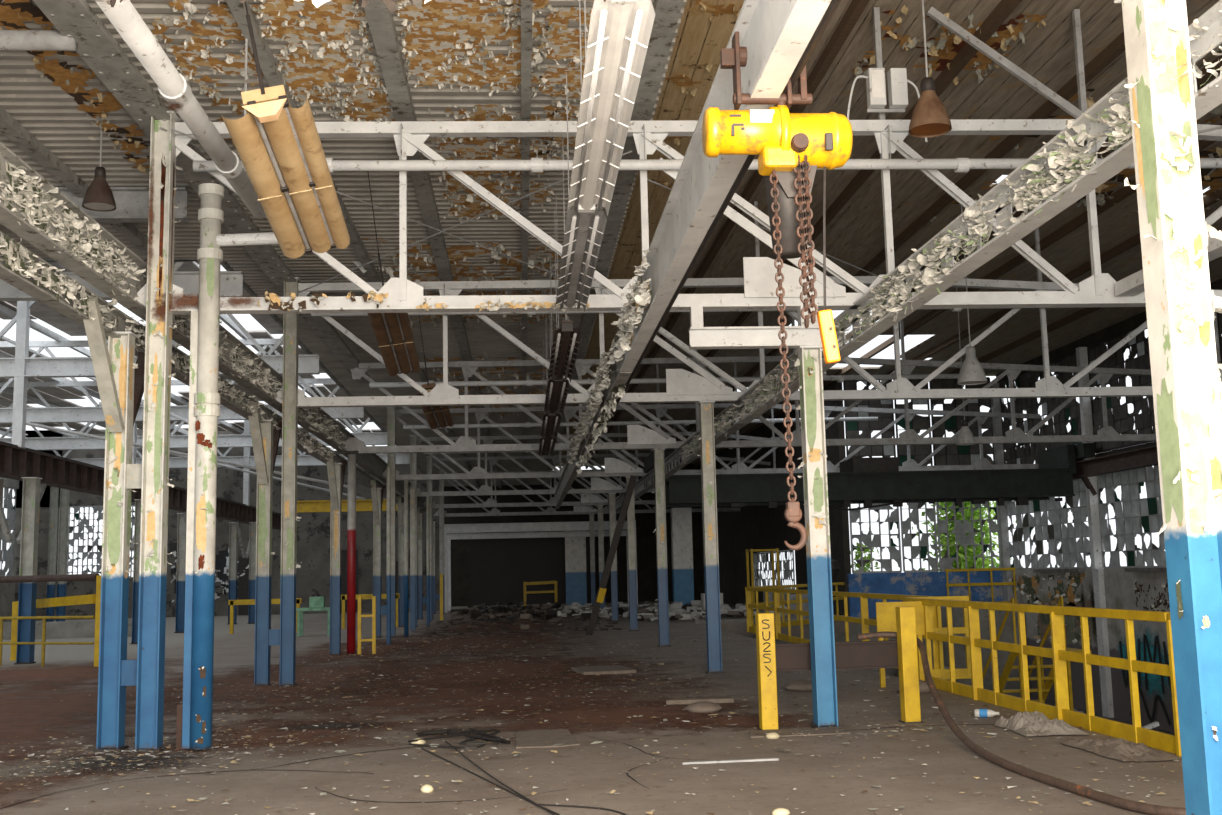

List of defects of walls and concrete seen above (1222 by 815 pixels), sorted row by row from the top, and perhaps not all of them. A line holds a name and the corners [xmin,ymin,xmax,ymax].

peeling [0,0,57,30]
peeling [686,0,743,23]
peeling [430,137,576,223]
peeling [833,0,1222,352]
peeling [0,50,191,495]
peeling [106,432,177,603]
corrosion [195,420,212,449]
peeling [680,350,827,539]
peeling [1157,378,1222,535]